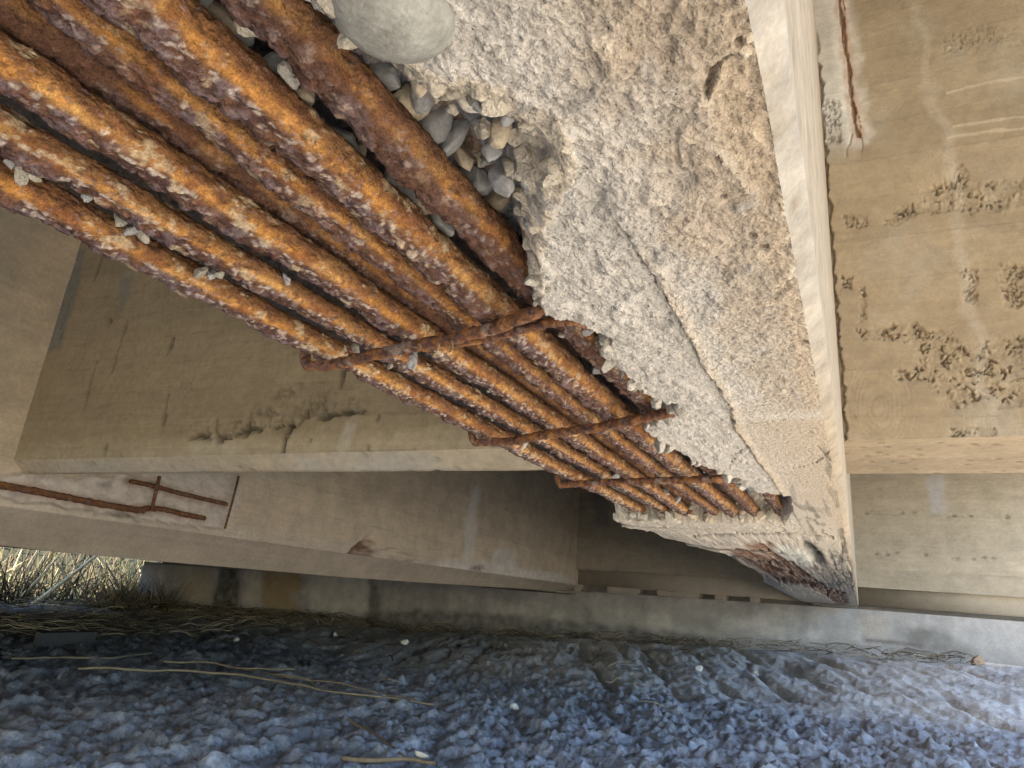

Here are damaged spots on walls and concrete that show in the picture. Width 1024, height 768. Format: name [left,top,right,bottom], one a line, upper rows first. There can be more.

rust [821,0,881,153]
spalling [0,0,794,534]
spalling [701,539,851,605]